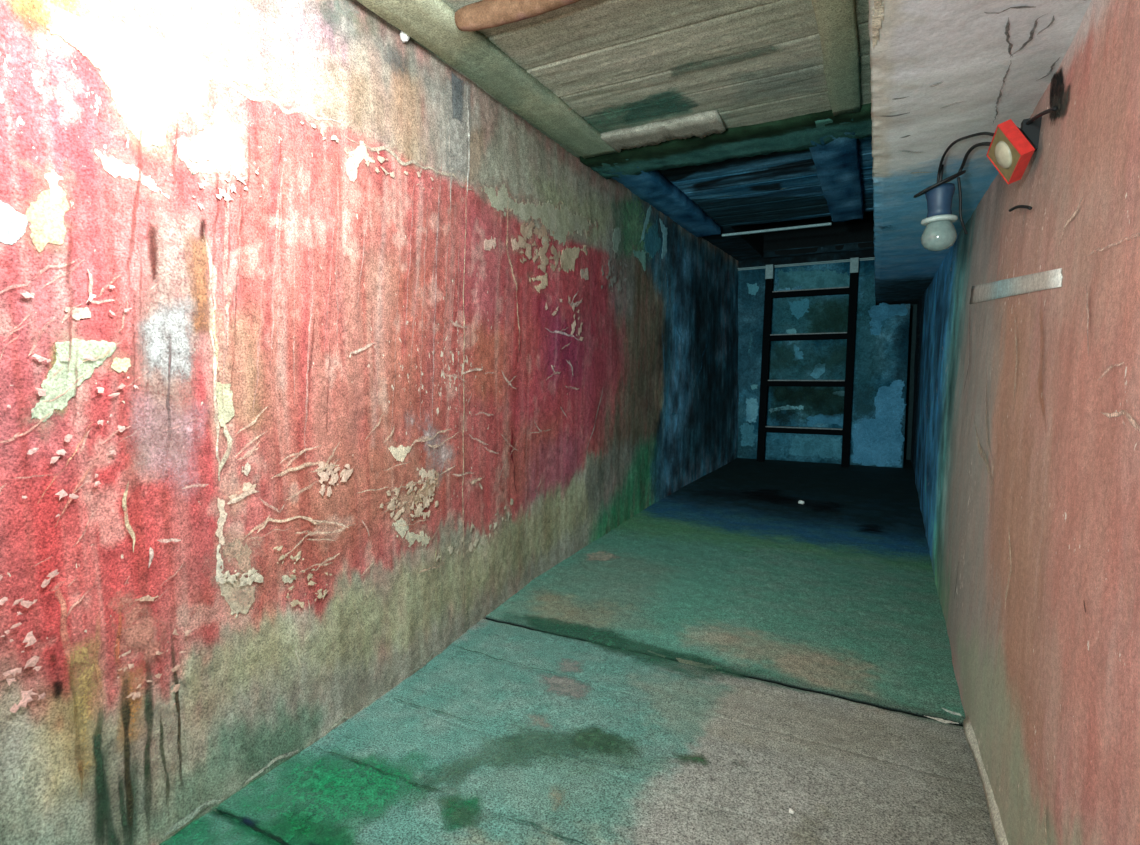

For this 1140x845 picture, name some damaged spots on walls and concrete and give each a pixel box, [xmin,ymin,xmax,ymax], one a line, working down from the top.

damp [671,46,776,76]
damp [627,92,698,121]
peeling [0,169,70,253]
peeling [36,6,668,341]
peeling [31,337,139,422]
peeling [215,462,264,618]
peeling [316,461,353,497]
peeling [379,467,439,547]
peeling [0,569,59,713]
damp [57,594,183,845]
damp [575,727,631,753]
damp [678,755,707,765]